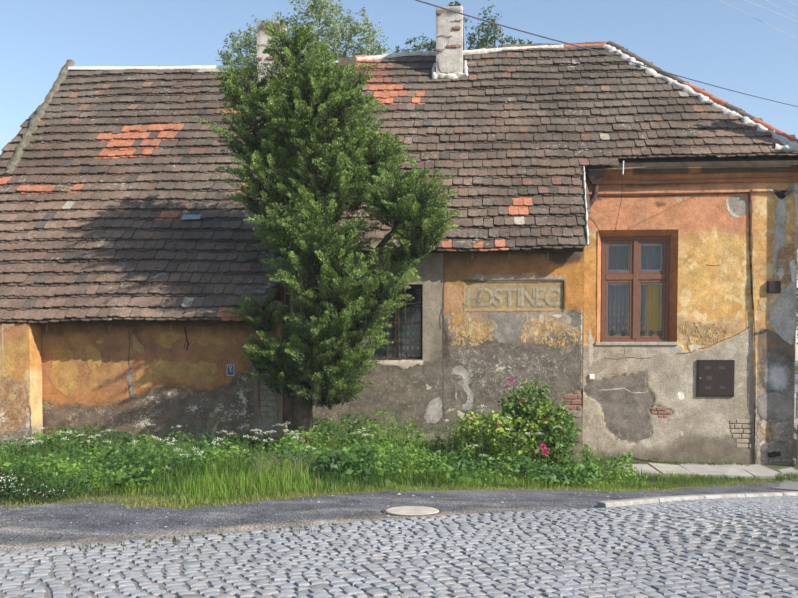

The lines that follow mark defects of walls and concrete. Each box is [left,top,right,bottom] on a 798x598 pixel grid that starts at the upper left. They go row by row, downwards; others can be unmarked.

flaking render [726,194,749,218]
peeling [766,183,798,284]
peeling [0,376,31,450]
peeling [49,340,105,398]
crack [125,326,135,426]
peeling [131,334,219,405]
spalling [189,371,277,431]
peeling [447,308,597,418]
flaking render [563,365,673,444]
crack [589,192,756,463]
flaking render [729,418,793,465]
leakage [758,328,795,392]